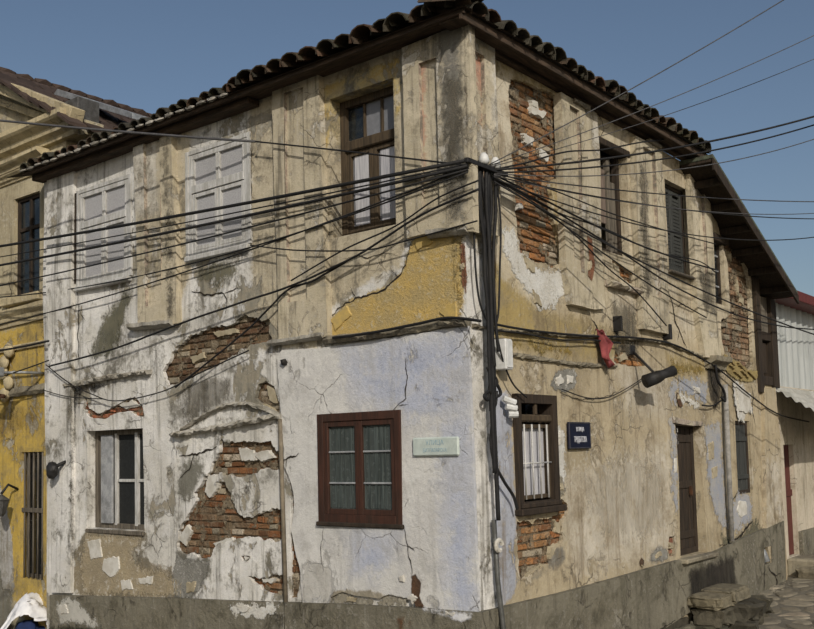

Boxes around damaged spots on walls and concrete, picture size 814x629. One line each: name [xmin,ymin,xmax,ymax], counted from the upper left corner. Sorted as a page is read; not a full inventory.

spalling [502,80,564,312]
spalling [85,397,144,419]
spalling [79,441,282,598]
spalling [166,316,272,385]
peeling [331,236,468,335]
spalling [516,421,567,580]
peeling [666,375,710,517]
peeling [704,418,753,534]
spalling [721,246,758,423]
peeling [56,597,98,629]
peeling [228,539,300,620]